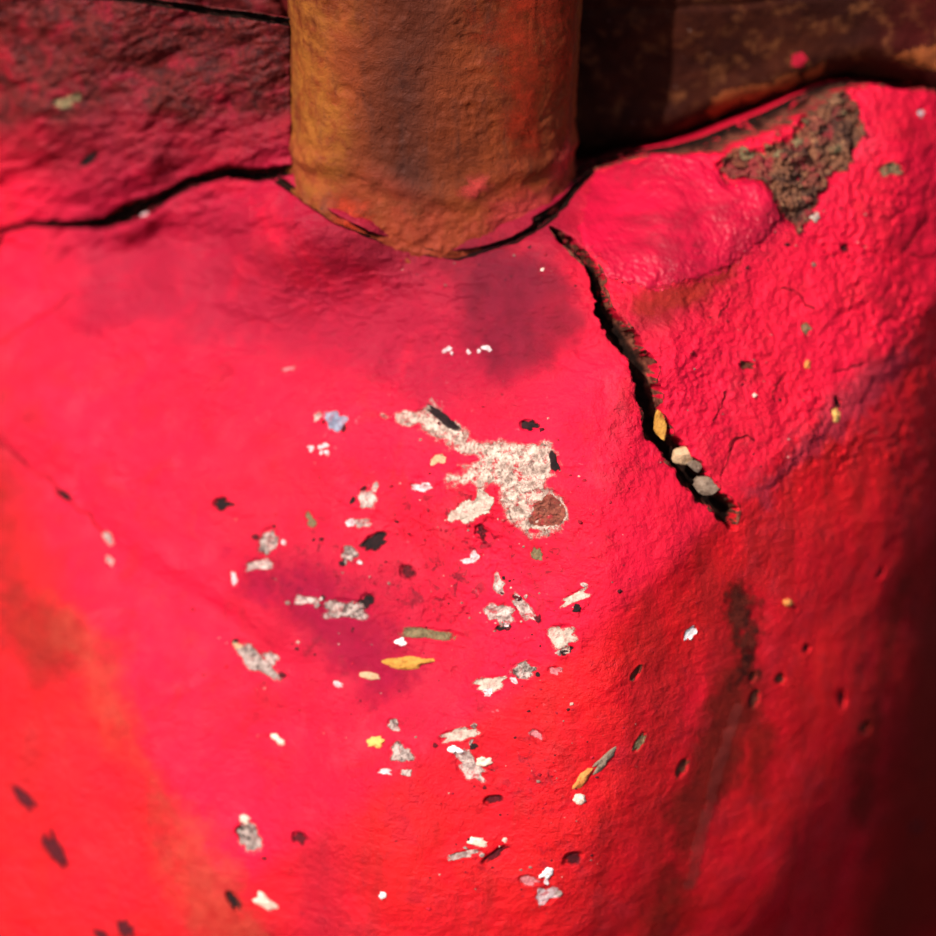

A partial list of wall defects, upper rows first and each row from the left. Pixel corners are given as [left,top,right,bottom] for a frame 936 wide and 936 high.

spalling [720,90,867,234]
crack [0,164,382,243]
crack [423,77,936,525]
spalling [381,399,568,561]
peeling [339,481,387,566]
peeling [295,594,375,632]
peeling [483,572,541,631]
peeling [474,661,563,696]
peeling [548,627,577,656]
peeling [366,719,414,777]
peeling [433,723,502,803]
peeling [520,867,562,905]